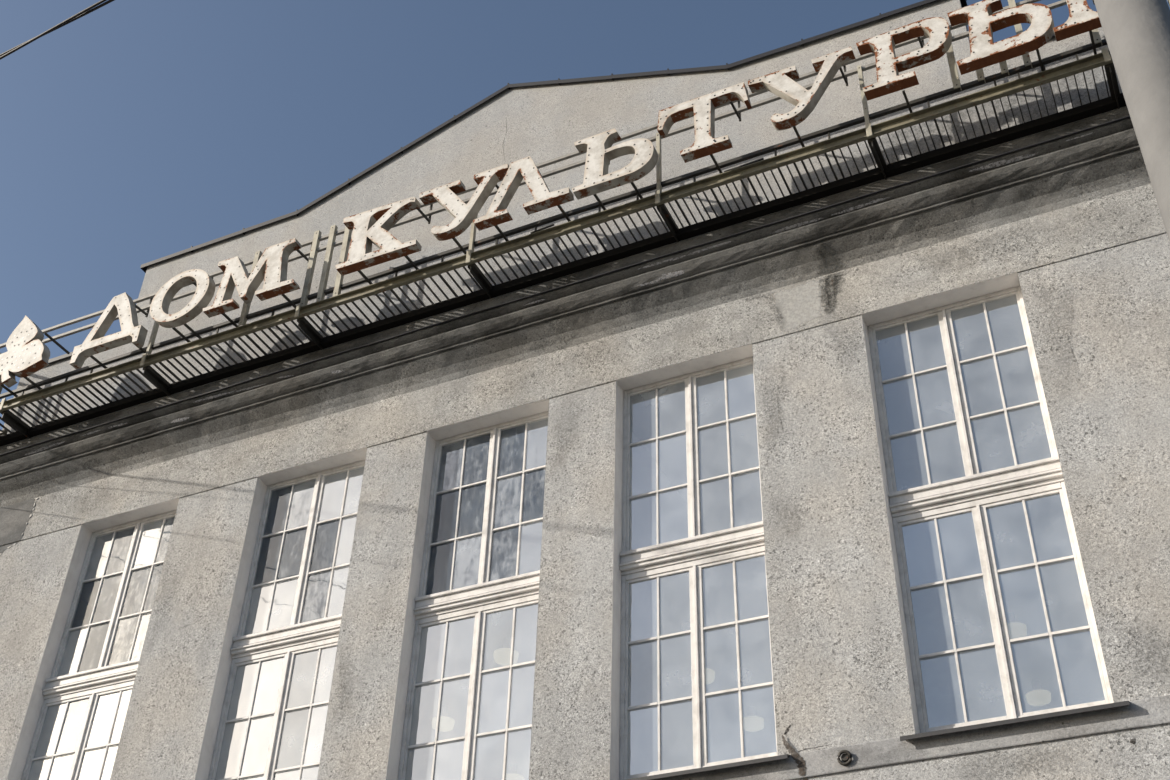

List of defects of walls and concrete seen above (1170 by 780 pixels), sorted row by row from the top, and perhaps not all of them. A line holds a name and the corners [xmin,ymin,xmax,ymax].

leakage [816,244,842,312]
crack [782,725,832,780]